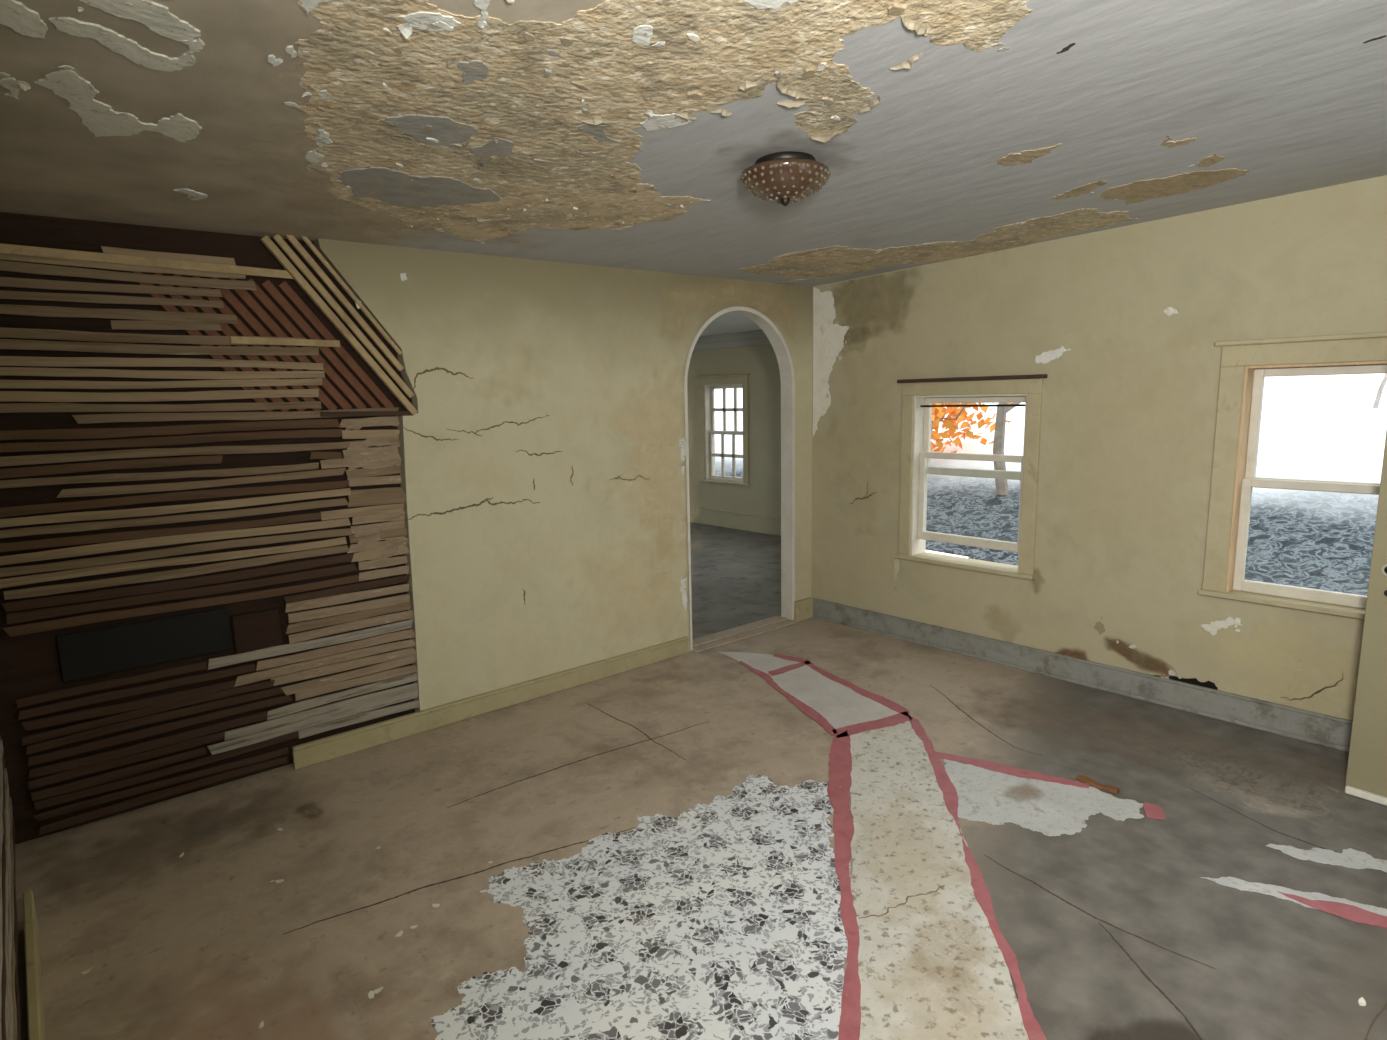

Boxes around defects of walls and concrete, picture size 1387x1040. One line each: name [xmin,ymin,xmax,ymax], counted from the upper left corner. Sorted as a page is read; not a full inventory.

peeling [0,0,205,72]
peeling [0,65,202,143]
peeling [268,0,1032,244]
peeling [996,143,1062,166]
peeling [173,188,208,200]
peeling [738,154,1249,435]
crack [412,367,472,390]
crack [403,415,574,520]